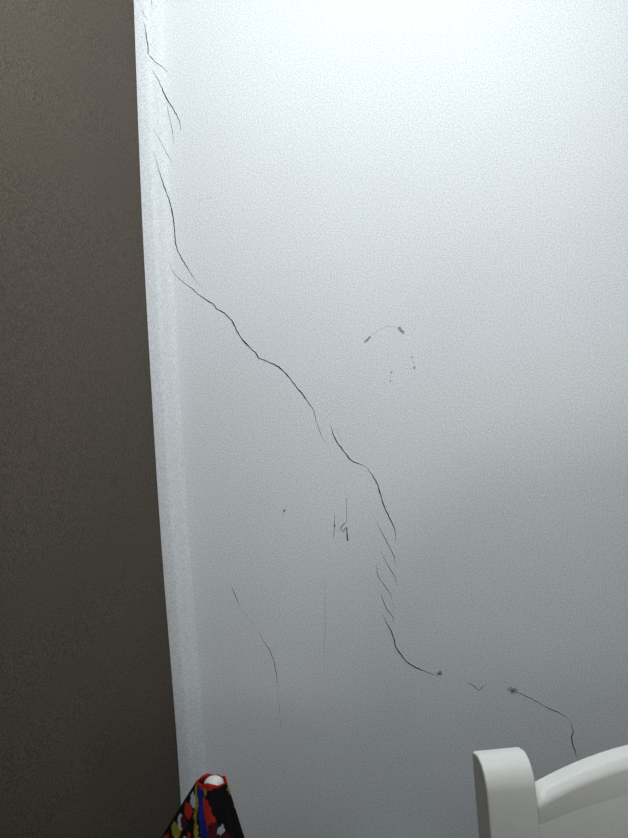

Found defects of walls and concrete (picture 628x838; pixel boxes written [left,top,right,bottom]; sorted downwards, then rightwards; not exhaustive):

crack [142,0,438,677]
crack [231,584,282,733]
crack [507,686,578,761]